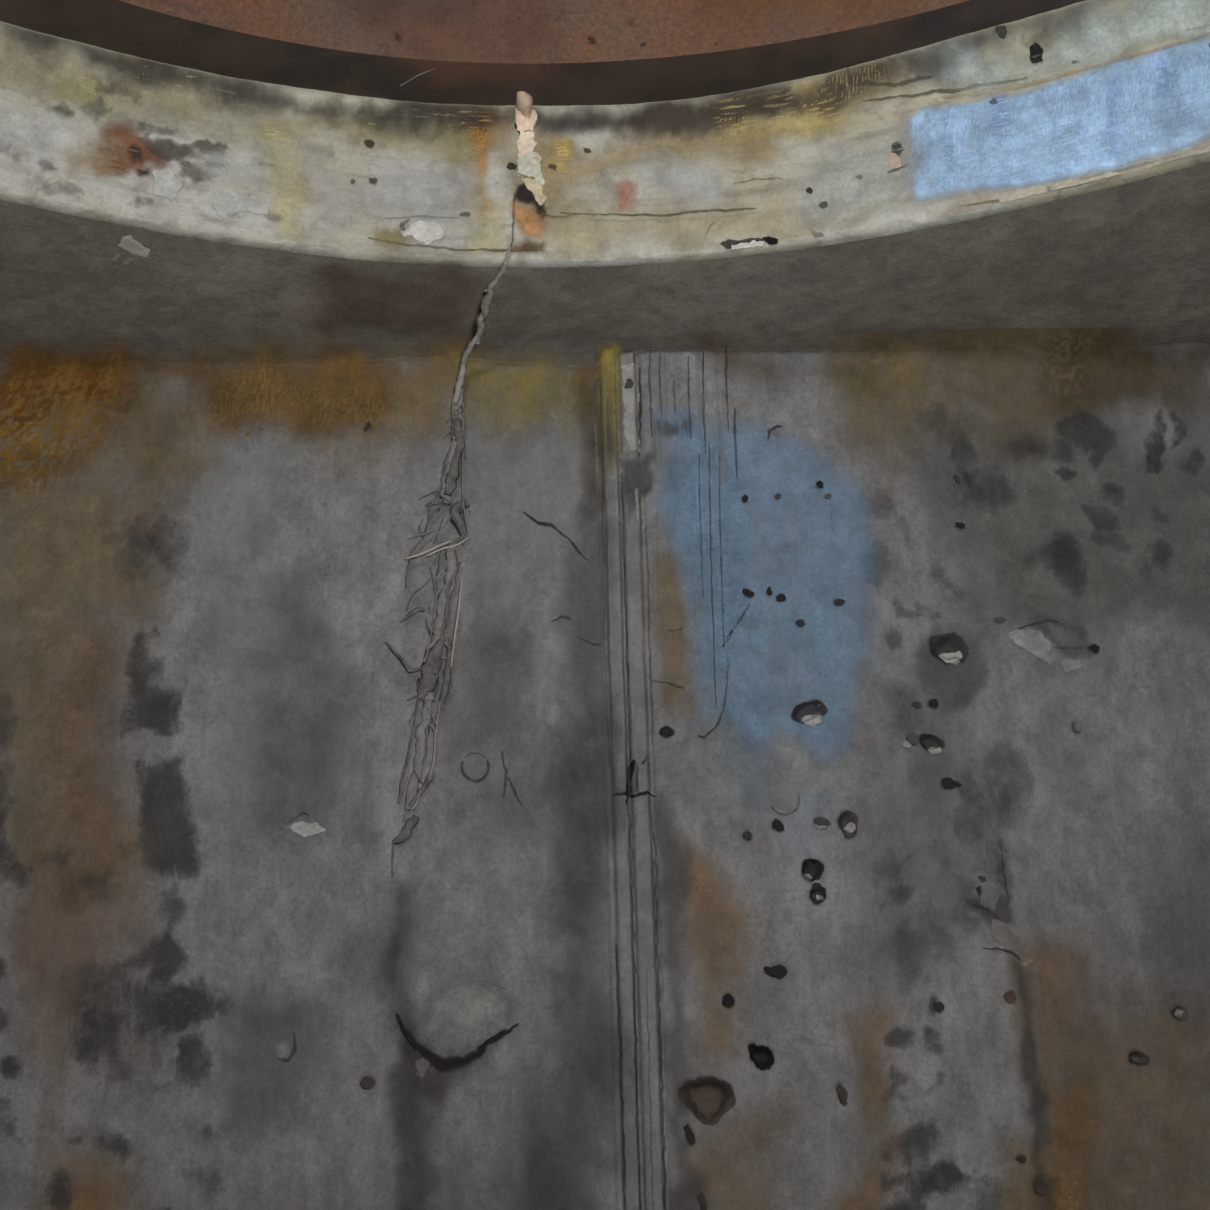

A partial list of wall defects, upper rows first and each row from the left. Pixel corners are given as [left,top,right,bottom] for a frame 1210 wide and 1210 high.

corrosion [94,126,164,175]
spalling [367,215,534,252]
spalling [720,236,778,250]
spalling [929,632,969,665]
spalling [1008,617,1088,673]
leakage [126,636,179,735]
spalling [791,700,828,726]
leakage [137,758,198,875]
leakage [130,934,225,1080]
spalling [679,1076,736,1124]